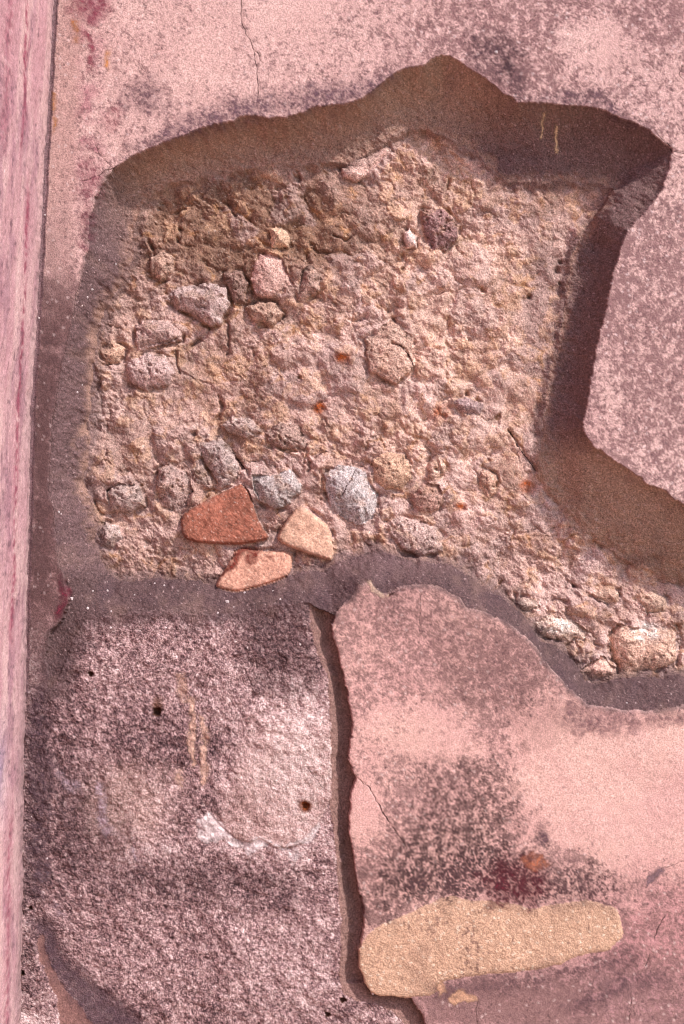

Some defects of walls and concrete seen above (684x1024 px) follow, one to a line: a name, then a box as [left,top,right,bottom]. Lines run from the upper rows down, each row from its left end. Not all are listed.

crack [240,0,261,104]
spalling [45,55,684,712]